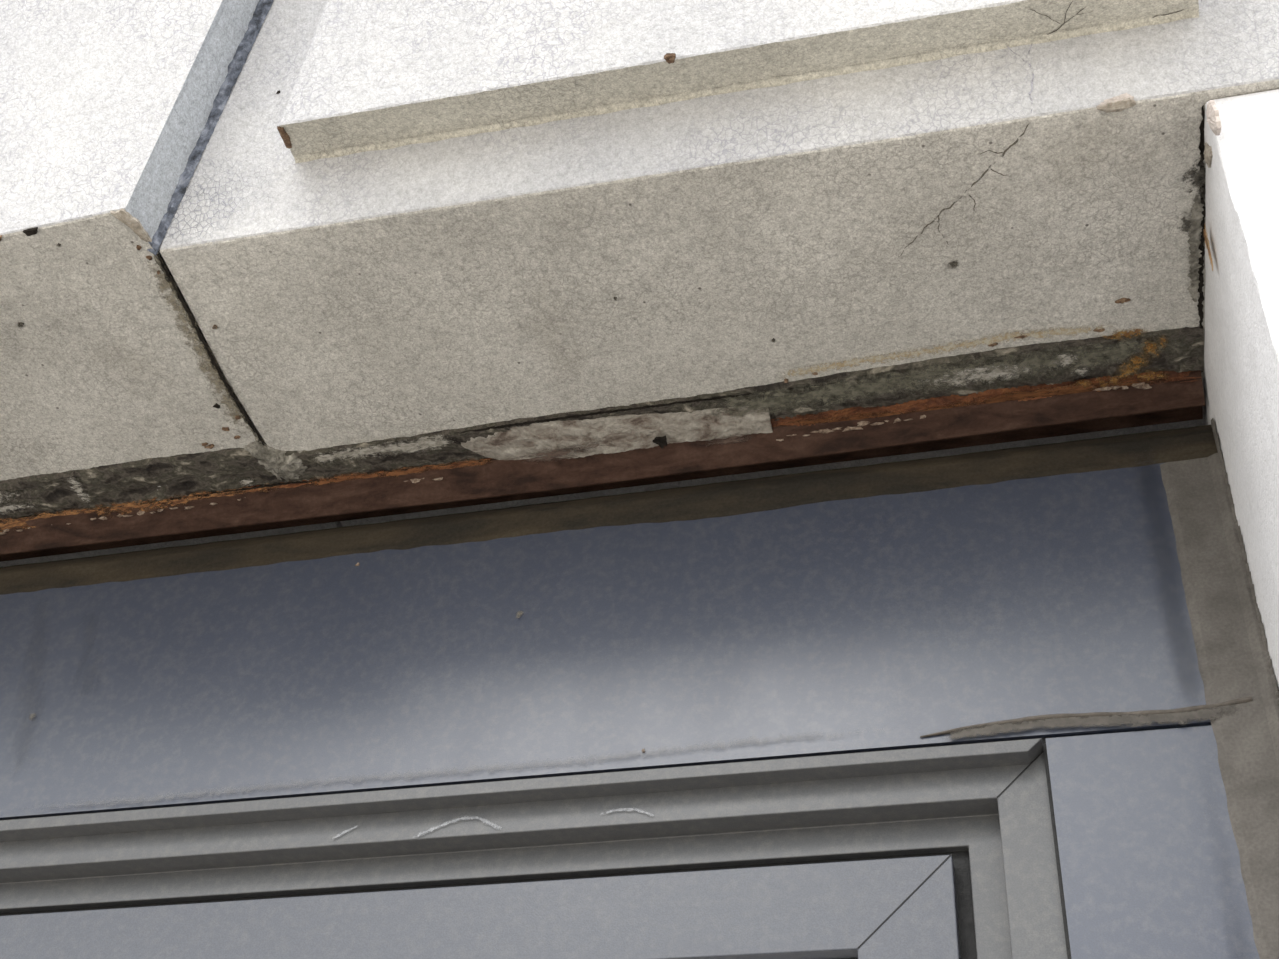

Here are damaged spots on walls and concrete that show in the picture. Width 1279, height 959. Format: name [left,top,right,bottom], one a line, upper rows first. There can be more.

crack [899,1,1100,257]
crack [154,184,265,446]
peeling [316,406,926,462]
corrosion [770,329,1201,427]
peeling [1092,382,1152,391]
corrosion [0,458,494,532]